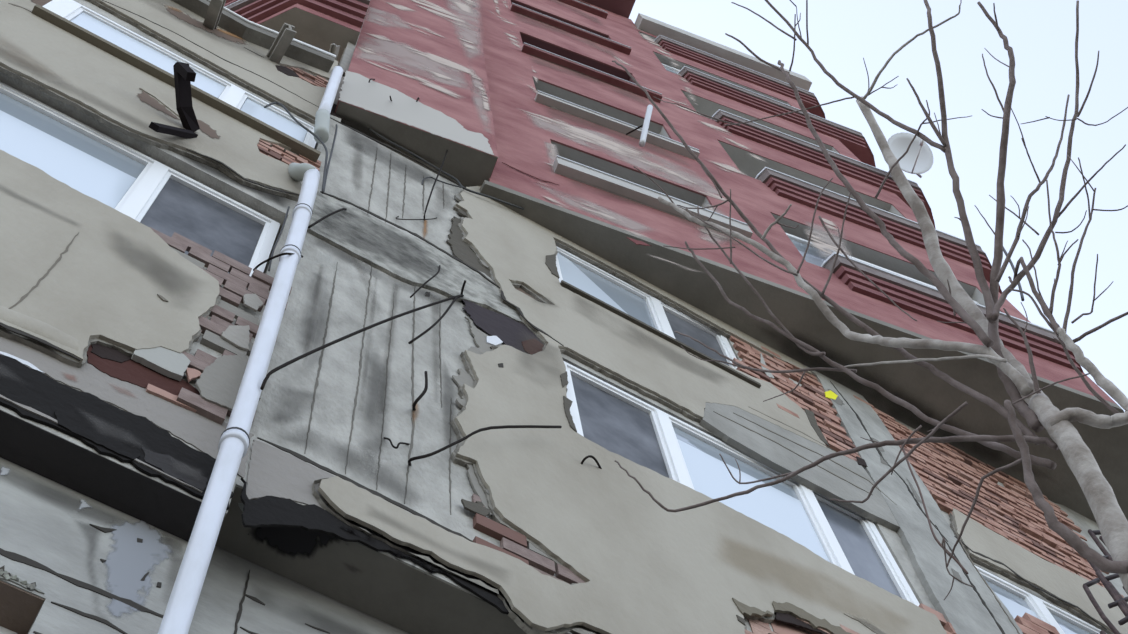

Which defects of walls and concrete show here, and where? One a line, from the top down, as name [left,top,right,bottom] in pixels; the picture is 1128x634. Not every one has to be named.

peeling [361,0,489,120]
peeling [275,65,499,158]
crack [0,232,81,361]
flaking render [87,227,274,425]
flaking render [446,195,495,281]
spalling [462,300,544,355]
flaking render [545,254,560,279]
flaking render [560,371,577,433]
flaking render [729,336,1109,588]
flaking render [461,464,585,585]
flaking render [732,597,859,634]
flaking render [1014,612,1060,634]